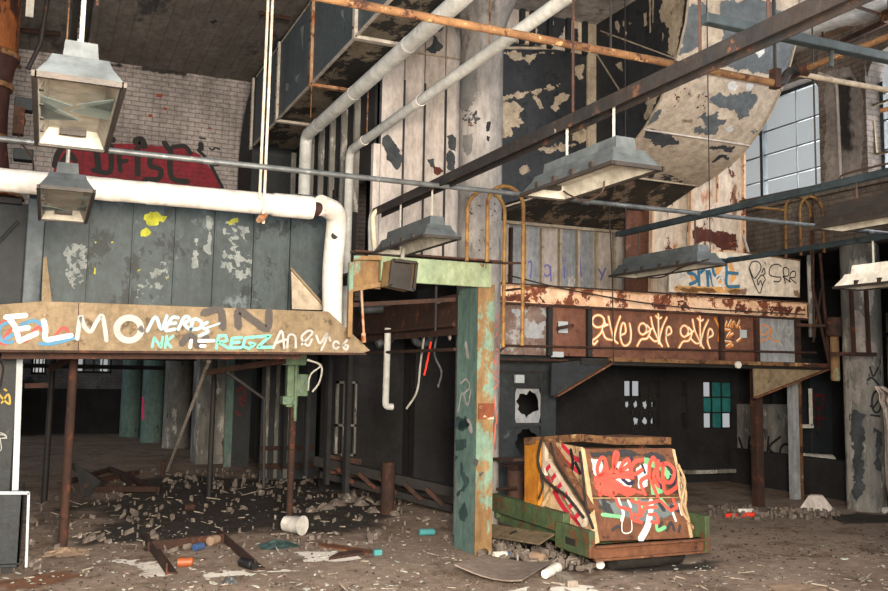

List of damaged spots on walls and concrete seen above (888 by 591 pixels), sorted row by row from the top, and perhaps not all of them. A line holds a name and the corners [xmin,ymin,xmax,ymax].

peeling [504,17,579,65]
peeling [643,0,782,58]
peeling [722,42,794,74]
peeling [643,96,679,148]
peeling [694,91,758,135]
peeling [382,135,402,170]
peeling [446,134,456,171]
peeling [709,145,736,163]
corrosion [501,294,545,308]
corrosion [677,287,716,311]
corrosion [728,288,747,314]
corrosion [769,290,805,316]